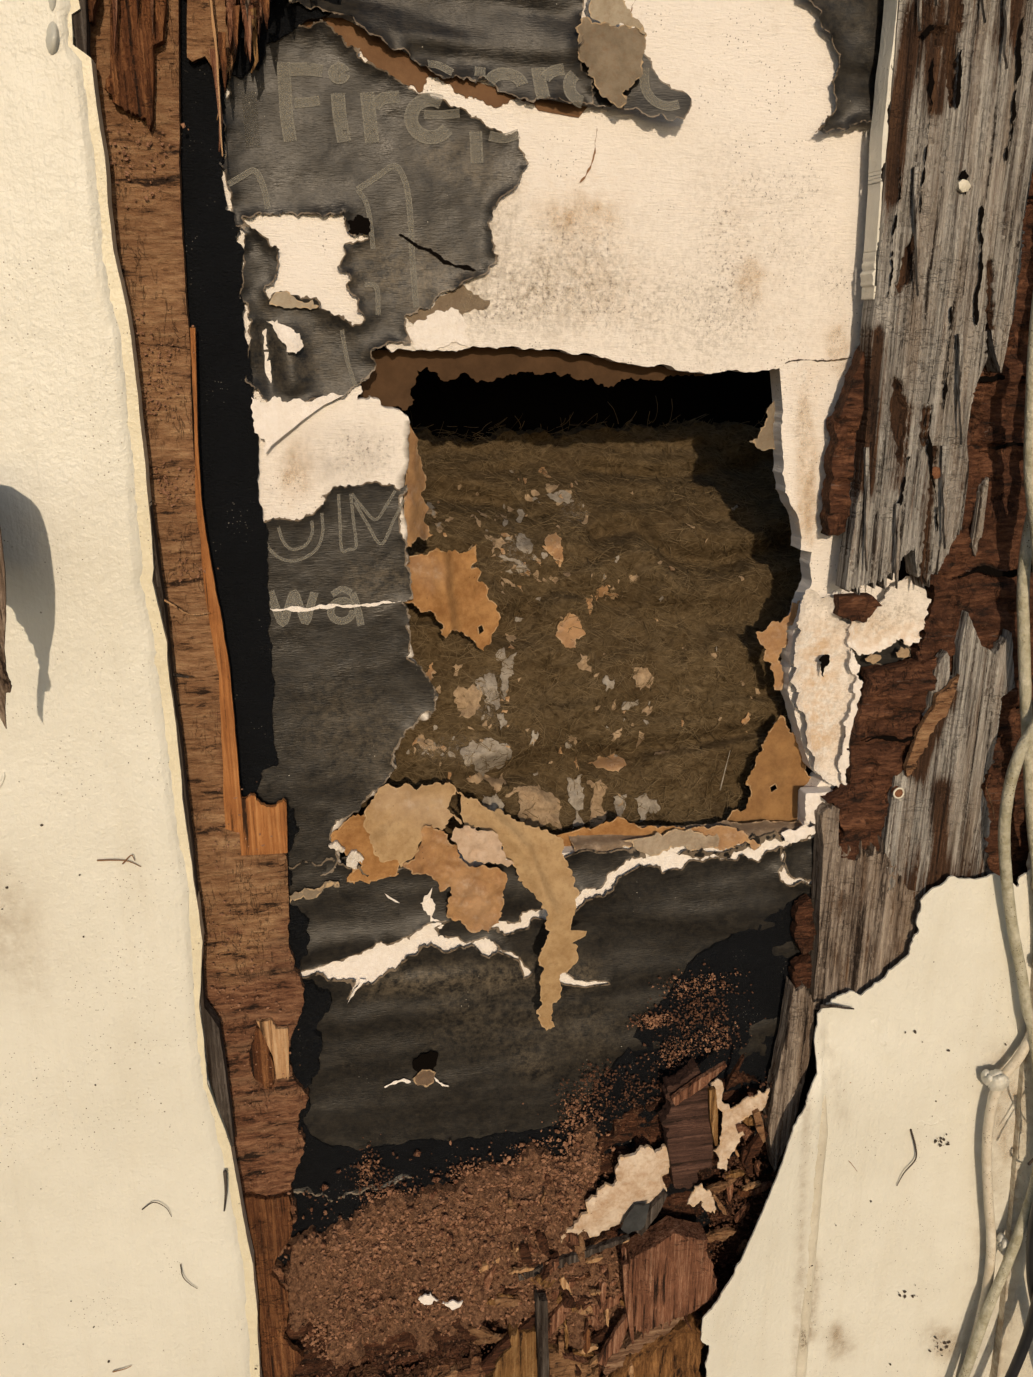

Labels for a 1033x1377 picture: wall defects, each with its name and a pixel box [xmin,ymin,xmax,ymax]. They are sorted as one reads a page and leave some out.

crack [399,234,485,271]
peeling [328,840,364,869]